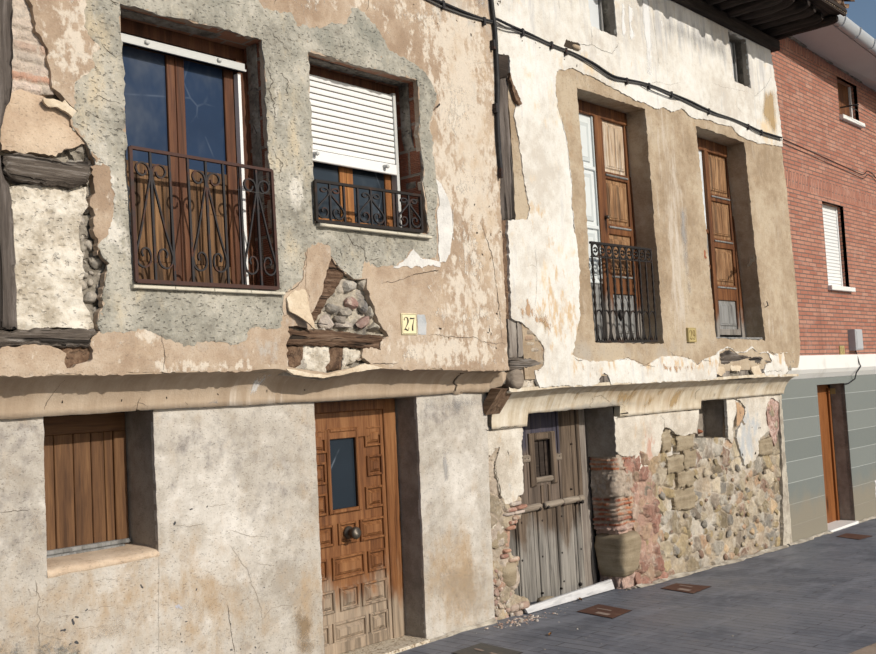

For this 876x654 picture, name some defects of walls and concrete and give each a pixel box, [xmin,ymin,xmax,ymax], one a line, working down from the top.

flaking render [0,0,105,368]
flaking render [279,244,384,391]
flaking render [463,55,551,415]
flaking render [717,349,771,380]
water stain [764,93,775,129]
crack [232,531,291,619]
flaking render [488,447,530,620]
flaking render [589,398,782,589]